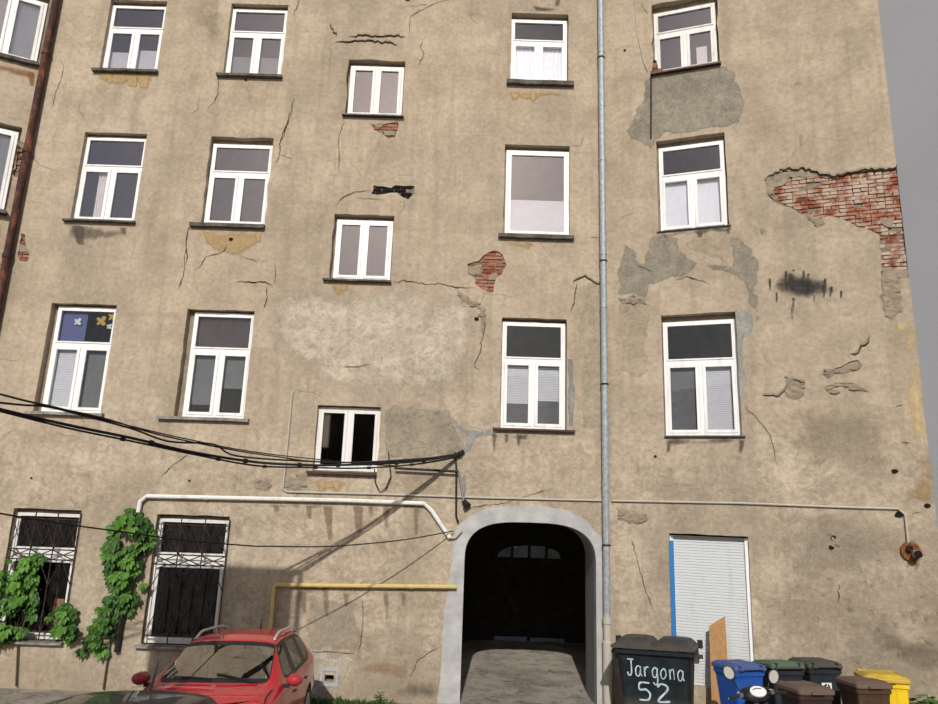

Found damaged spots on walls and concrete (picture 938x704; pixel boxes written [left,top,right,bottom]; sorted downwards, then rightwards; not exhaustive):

crack [330,0,444,64]
flaking render [371,122,399,138]
flaking render [372,186,415,199]
flaking render [765,167,909,319]
flaking render [468,251,506,293]
peeling [457,291,487,335]
peeling [784,376,806,399]
peeling [822,361,868,394]